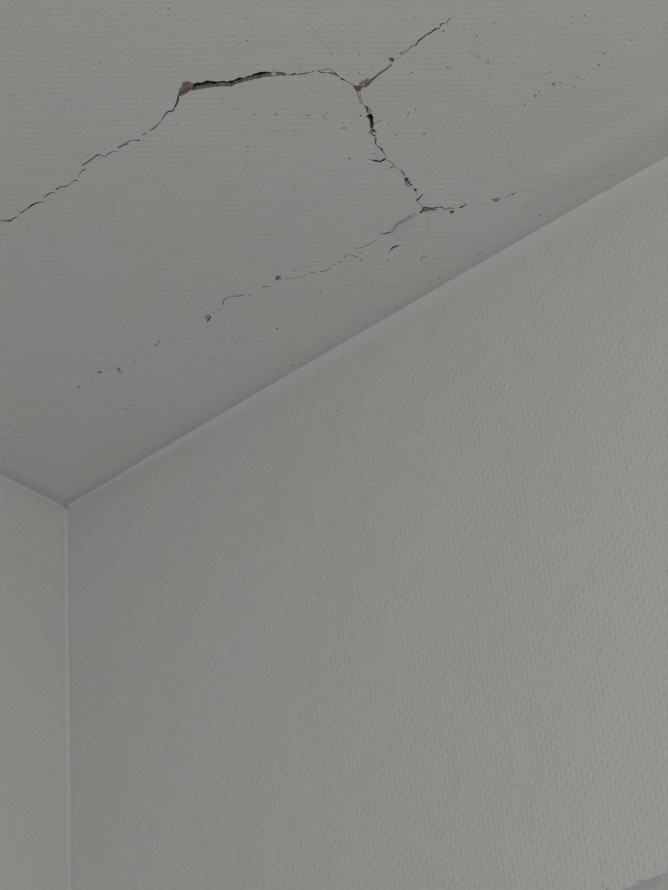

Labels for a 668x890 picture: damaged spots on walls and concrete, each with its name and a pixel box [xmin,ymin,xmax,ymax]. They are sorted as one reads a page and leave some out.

crack [0,17,529,322]